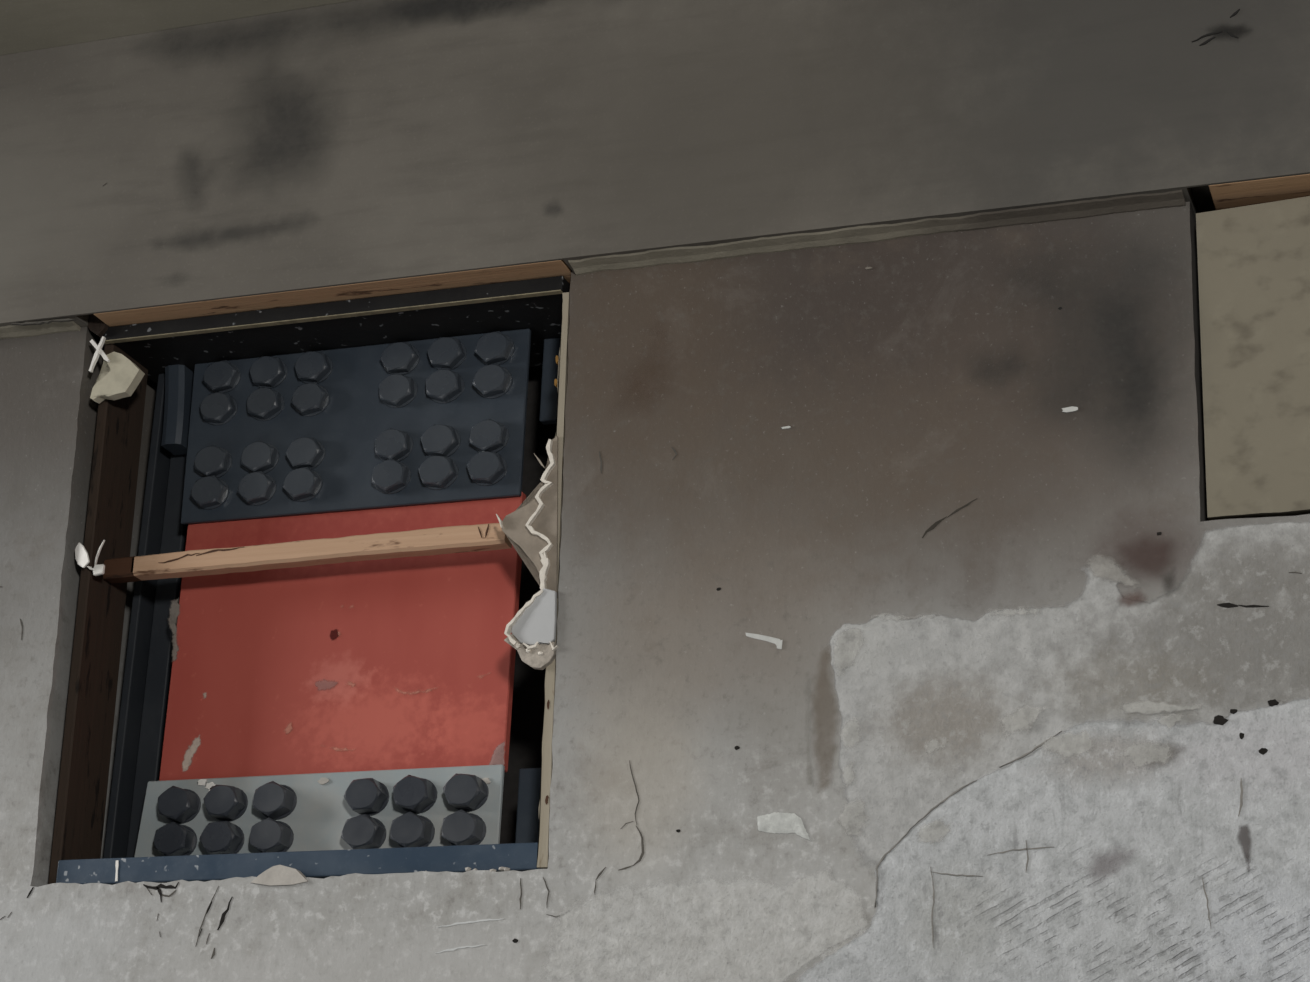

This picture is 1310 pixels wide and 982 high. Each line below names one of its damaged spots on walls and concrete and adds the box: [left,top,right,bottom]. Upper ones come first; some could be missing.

spalling [522,370,556,498]
spalling [489,560,558,844]
crack [594,760,644,896]
peeling [544,522,1310,982]
crack [874,730,1062,907]
crack [930,842,1051,948]